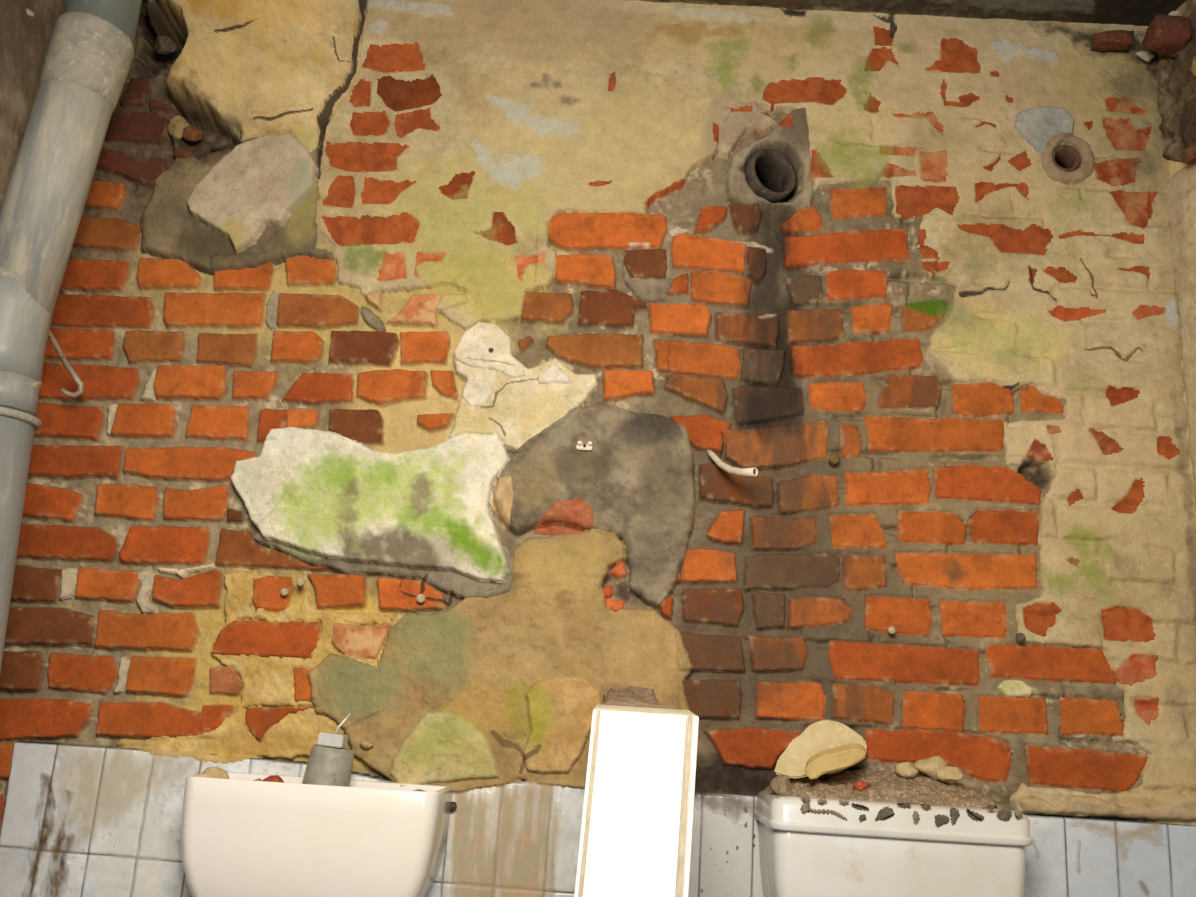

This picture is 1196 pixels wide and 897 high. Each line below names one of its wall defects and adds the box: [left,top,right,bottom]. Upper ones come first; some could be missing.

crack [253,0,367,179]
flaking render [140,0,899,297]
efflorescence [731,240,774,254]
flaking render [231,426,401,542]
flaking render [308,288,693,791]
flaking render [763,14,1196,826]